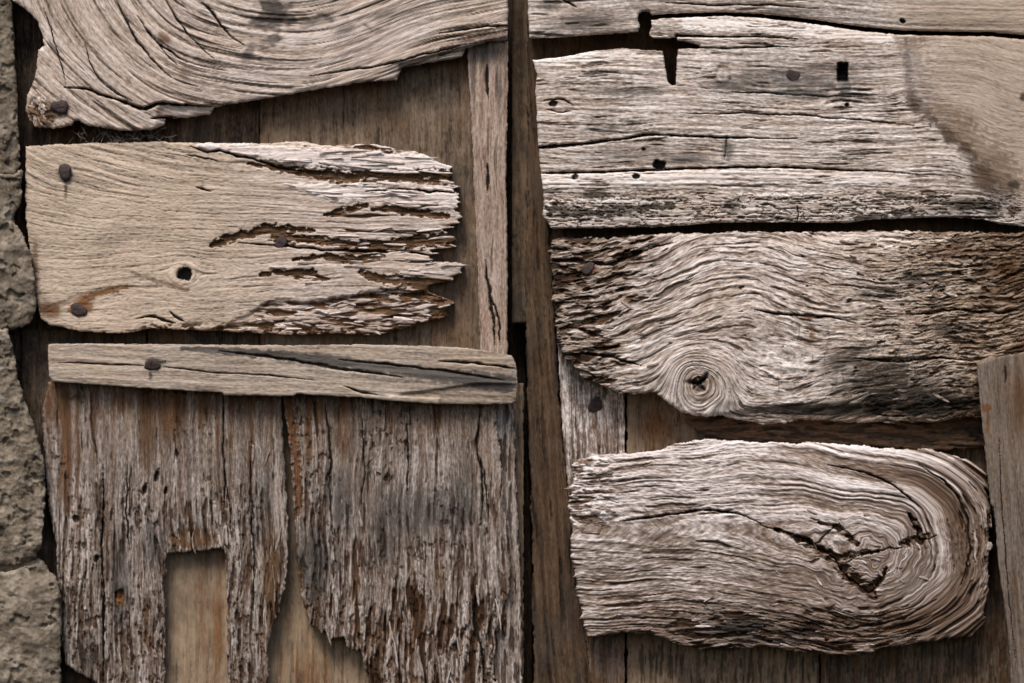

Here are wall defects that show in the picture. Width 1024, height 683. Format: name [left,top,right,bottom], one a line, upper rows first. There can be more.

rust [51,284,128,316]
crack [246,243,433,256]
crack [65,260,515,596]
crack [620,465,935,592]